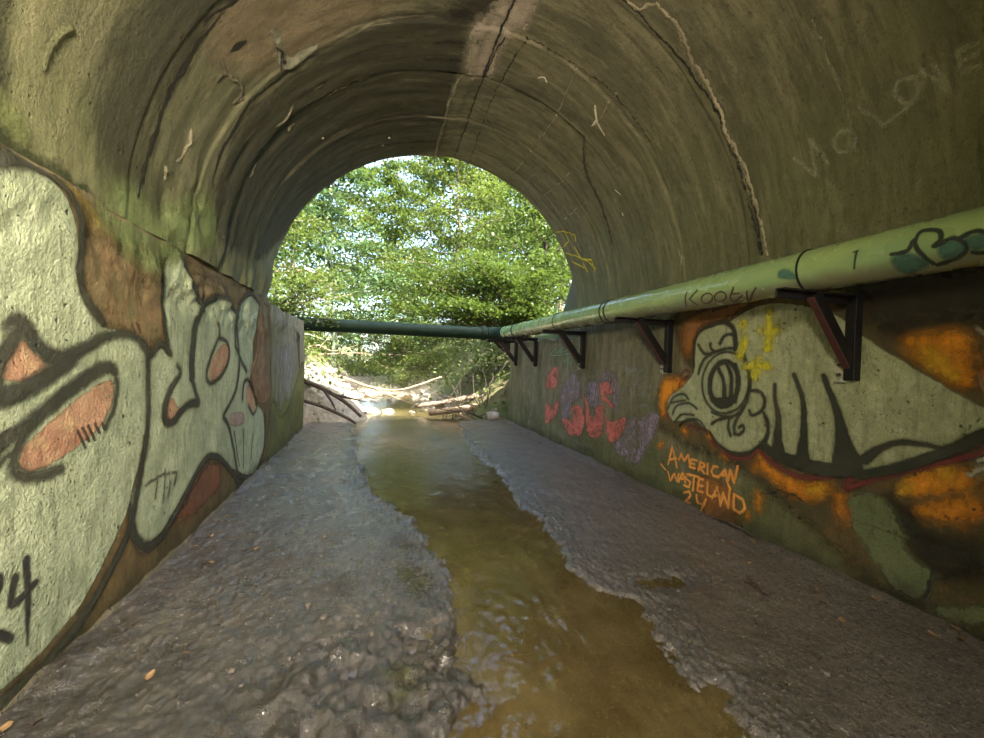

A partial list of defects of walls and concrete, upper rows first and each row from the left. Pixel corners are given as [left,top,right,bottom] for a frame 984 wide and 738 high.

crack [137,0,238,198]
crack [212,54,319,188]
damp [96,0,539,258]
crack [325,0,653,158]
crack [554,111,612,241]
crack [623,0,769,256]